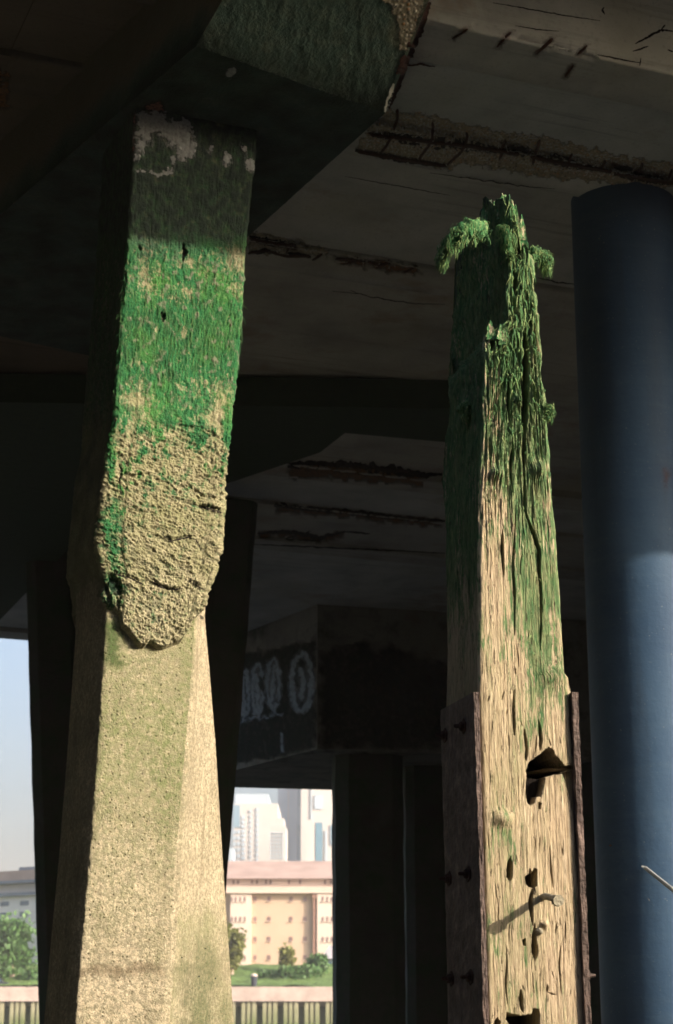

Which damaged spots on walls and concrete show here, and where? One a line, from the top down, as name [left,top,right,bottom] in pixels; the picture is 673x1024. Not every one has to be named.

crack [496,3,605,31]
crack [599,25,673,65]
peeling [133,110,255,178]
spalling [355,107,673,190]
spalling [248,233,419,275]
spalling [288,459,443,487]
spalling [257,502,445,543]